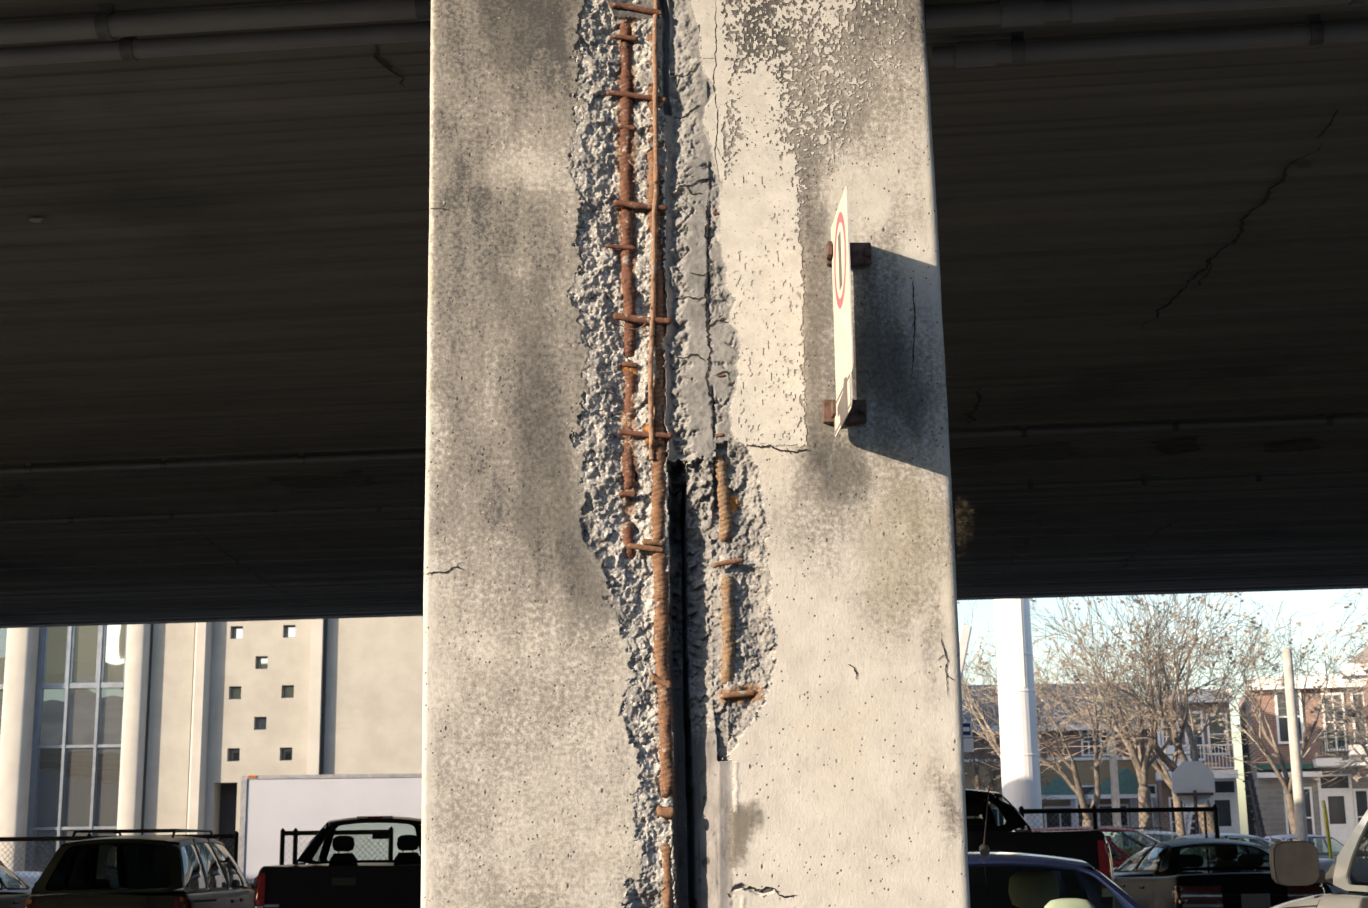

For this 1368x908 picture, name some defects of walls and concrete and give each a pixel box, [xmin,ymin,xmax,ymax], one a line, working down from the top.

spalling [566,0,678,908]
peeling [687,0,924,761]
crack [1139,109,1338,332]
crack [727,886,794,898]